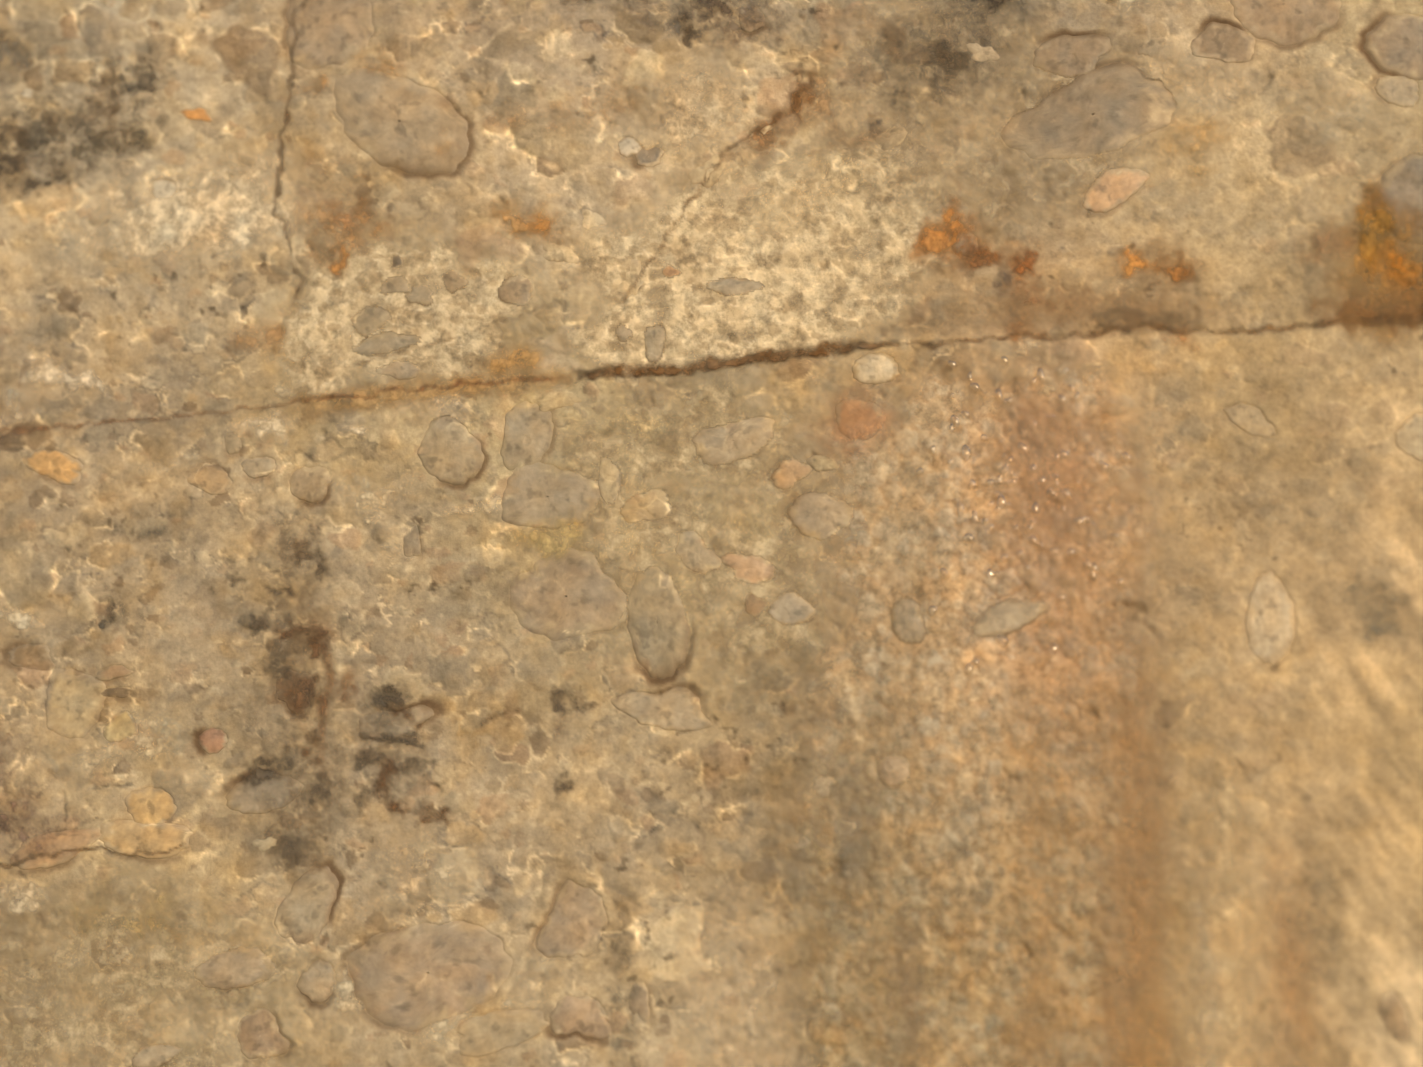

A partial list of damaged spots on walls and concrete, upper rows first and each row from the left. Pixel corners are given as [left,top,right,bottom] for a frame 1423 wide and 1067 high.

crack [275,78,292,251]
crack [516,324,1188,380]
rust [919,208,1041,341]
rust [1124,249,1194,285]
crack [1225,316,1423,333]
leakage [244,529,424,867]